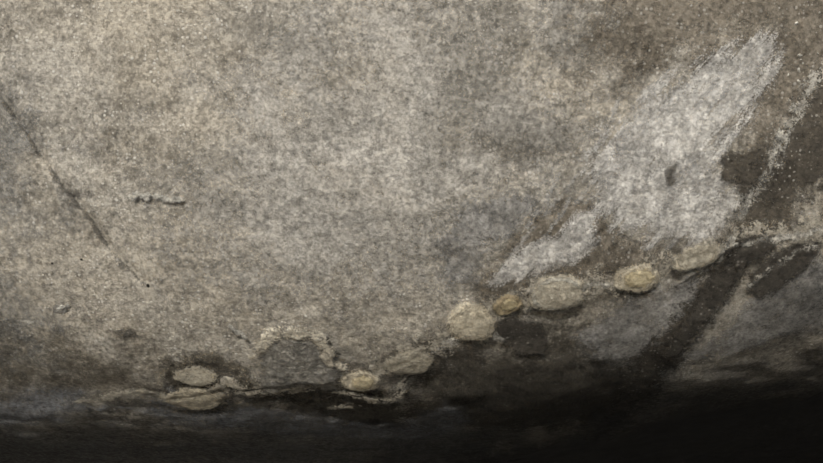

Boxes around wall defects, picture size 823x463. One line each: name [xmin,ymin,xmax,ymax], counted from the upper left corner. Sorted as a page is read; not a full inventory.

damp [476,86,581,171]
damp [0,325,137,424]